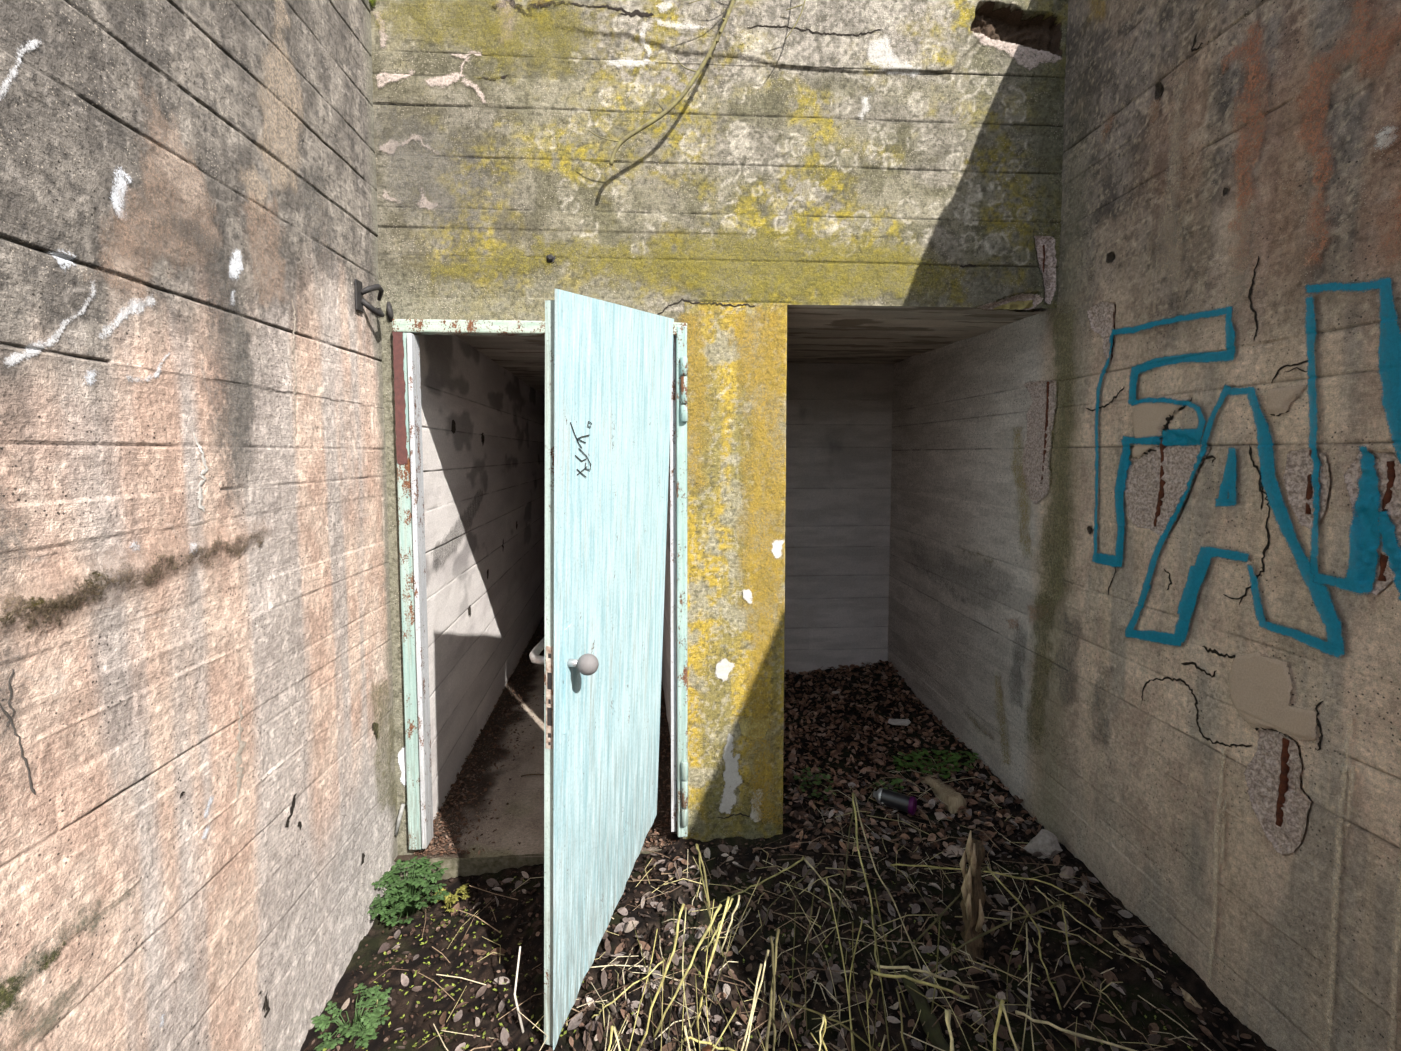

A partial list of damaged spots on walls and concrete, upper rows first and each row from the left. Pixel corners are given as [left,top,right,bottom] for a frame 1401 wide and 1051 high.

crack [492,0,654,17]
spalling [970,1,1063,57]
spalling [1124,428,1210,535]
spalling [1283,448,1401,595]
crack [0,669,36,795]
peeling [716,658,735,682]
peeling [719,734,763,822]
leakage [972,597,1079,764]
crack [1141,646,1285,747]
spalling [1244,729,1311,855]
crack [1315,701,1323,751]